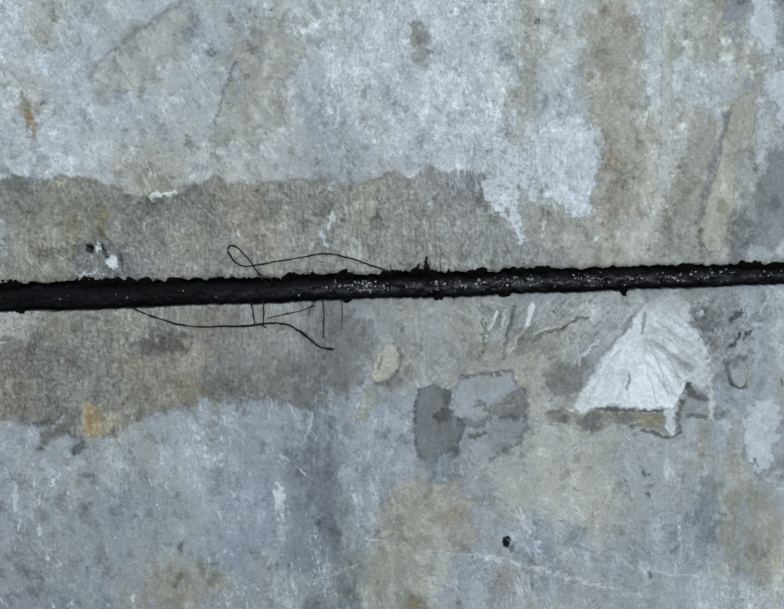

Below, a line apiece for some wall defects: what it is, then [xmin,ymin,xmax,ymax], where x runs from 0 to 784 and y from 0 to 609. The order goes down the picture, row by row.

leakage [0,0,570,284]
leakage [0,301,369,542]
peeling [414,370,530,465]
spalling [547,289,753,455]